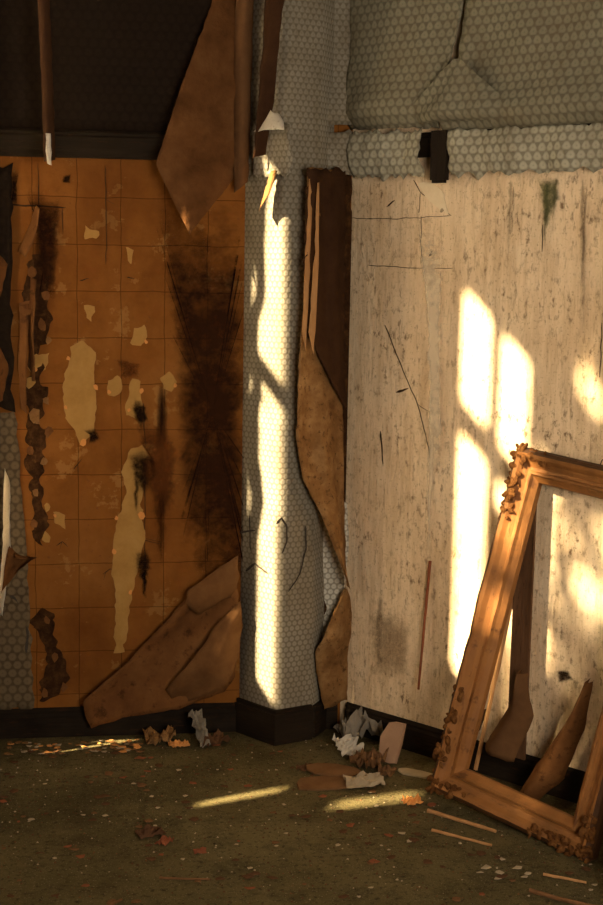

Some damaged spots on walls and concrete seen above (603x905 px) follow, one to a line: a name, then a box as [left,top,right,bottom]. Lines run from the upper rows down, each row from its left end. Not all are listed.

peeling [62,341,144,446]
peeling [130,325,148,346]
leakage [157,392,166,443]
peeling [160,371,177,392]
leakage [171,242,243,574]
spalling [343,175,352,502]
peeling [111,444,150,653]